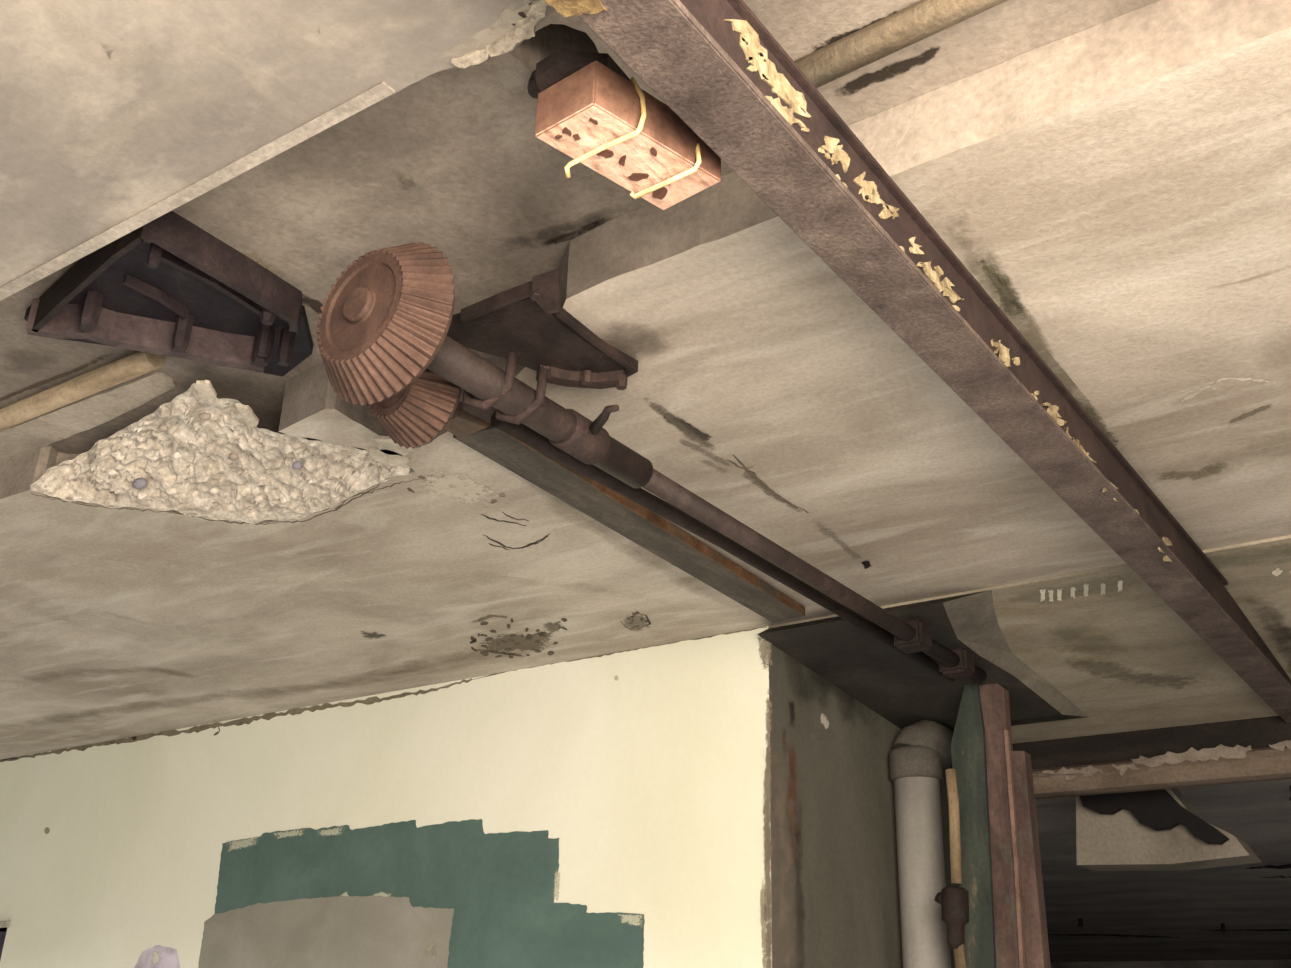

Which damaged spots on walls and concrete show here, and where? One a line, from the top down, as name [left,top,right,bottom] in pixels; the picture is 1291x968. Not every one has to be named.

spalling [446,0,607,68]
spalling [30,380,505,524]
crack [727,455,808,513]
peeling [1033,744,1252,781]
peeling [1269,740,1291,751]